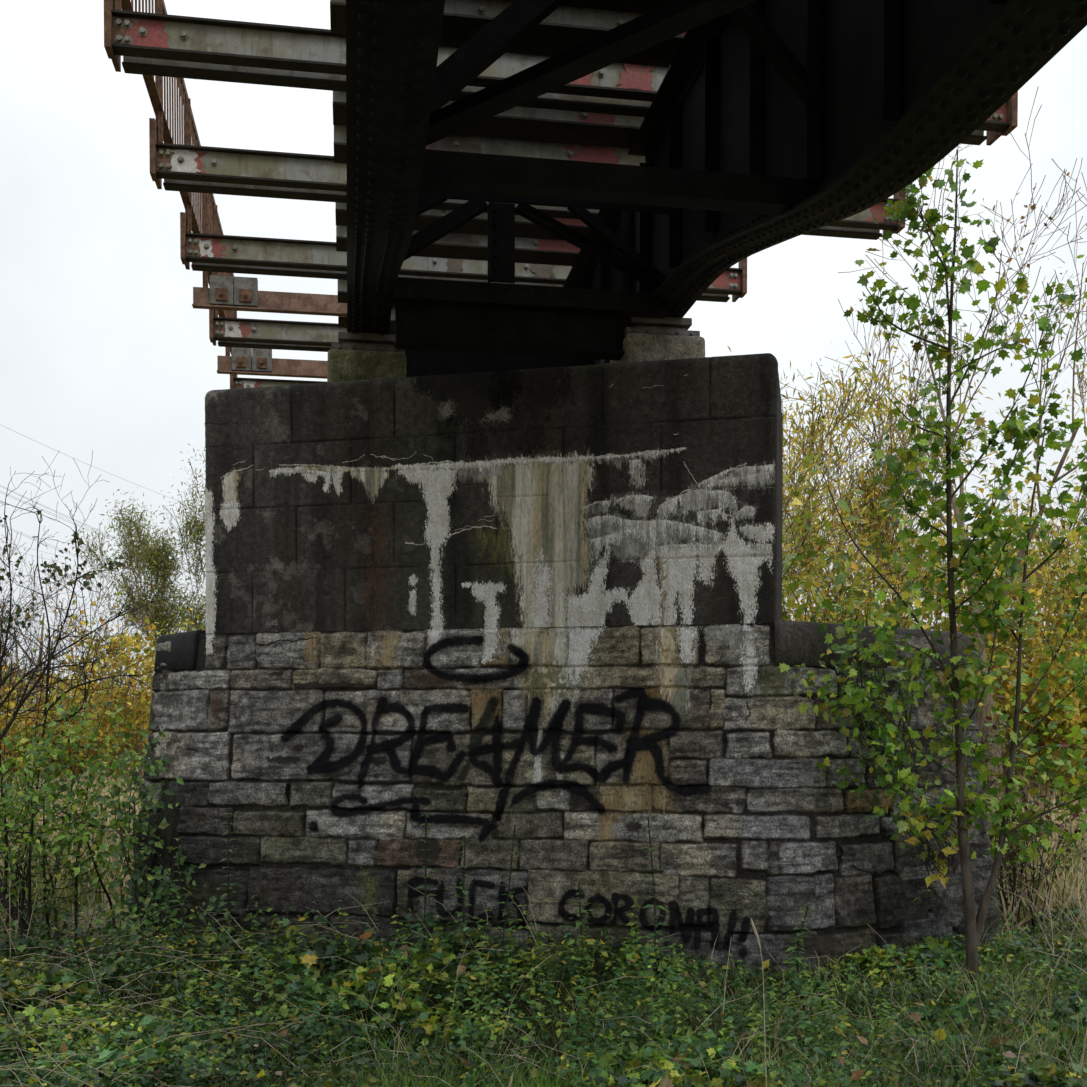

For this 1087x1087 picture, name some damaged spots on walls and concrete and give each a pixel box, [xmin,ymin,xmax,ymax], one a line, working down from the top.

peeling [167,149,201,173]
damp [205,470,243,656]
damp [270,366,789,796]